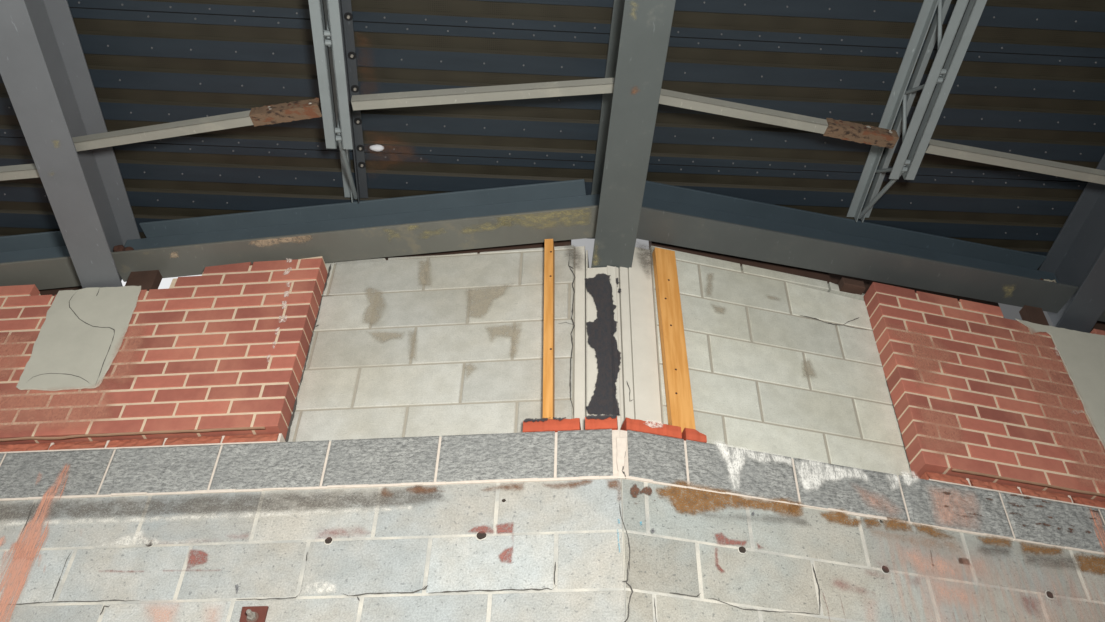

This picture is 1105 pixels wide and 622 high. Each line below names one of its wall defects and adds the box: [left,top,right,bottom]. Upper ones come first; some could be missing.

damp [714,442,867,489]
damp [888,472,918,488]
rust [657,481,800,514]
rust [979,537,1061,554]
crack [619,504,821,622]
rust [1077,555,1105,575]